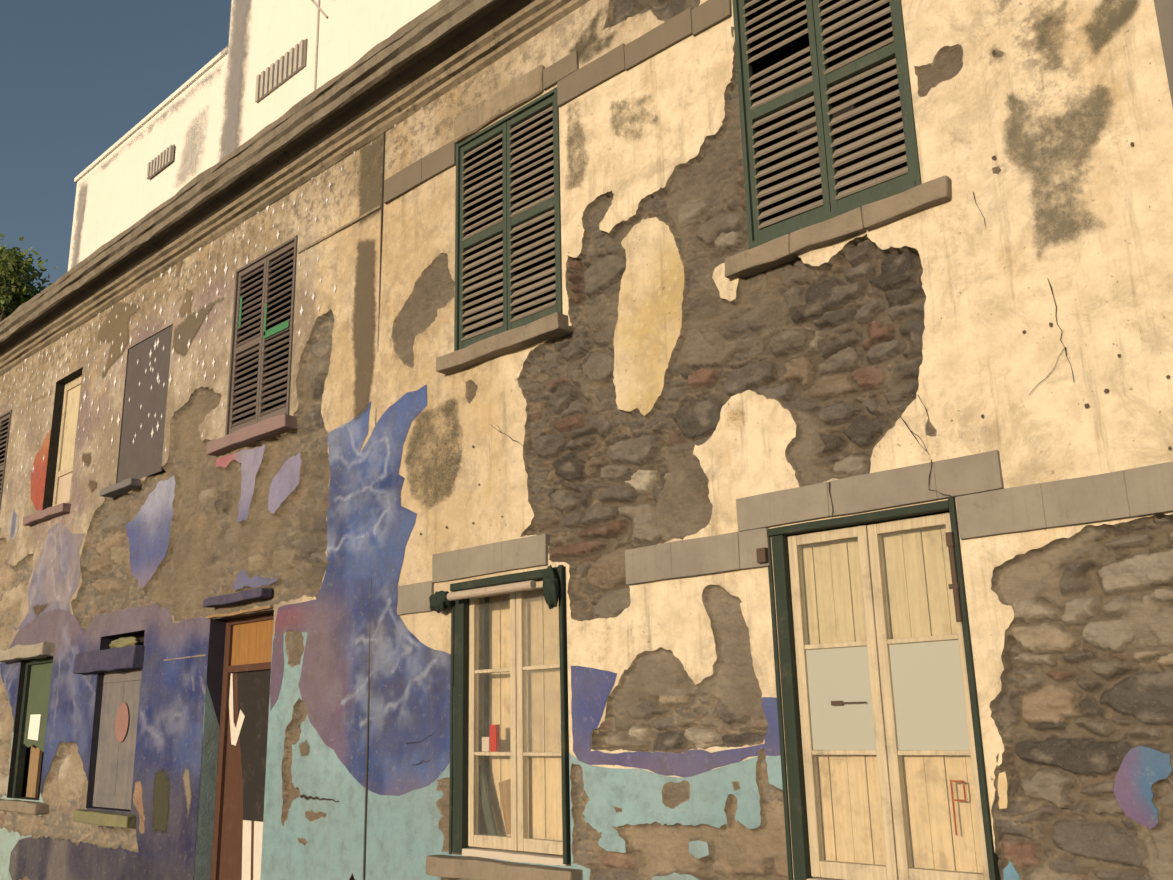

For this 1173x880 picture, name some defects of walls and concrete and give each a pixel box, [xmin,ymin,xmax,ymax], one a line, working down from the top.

flaking render [914,44,964,97]
leakage [1085,0,1138,50]
leakage [1006,86,1110,253]
flaking render [391,253,455,368]
flaking render [517,26,926,621]
crack [1031,278,1074,392]
flaking render [925,418,937,437]
flaking render [0,537,170,852]
flaking render [281,698,309,826]
flaking render [436,777,450,852]
flaking render [570,584,788,880]
flaking render [989,513,1173,880]